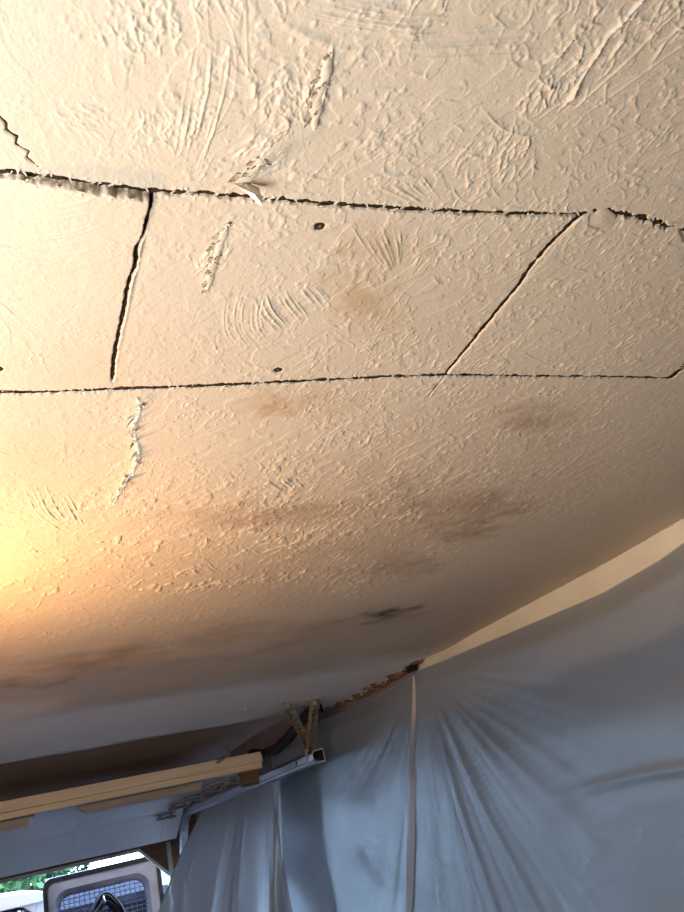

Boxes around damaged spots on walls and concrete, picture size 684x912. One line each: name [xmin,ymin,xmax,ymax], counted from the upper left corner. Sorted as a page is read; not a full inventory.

crack [0,116,684,396]
peeling [323,659,425,710]